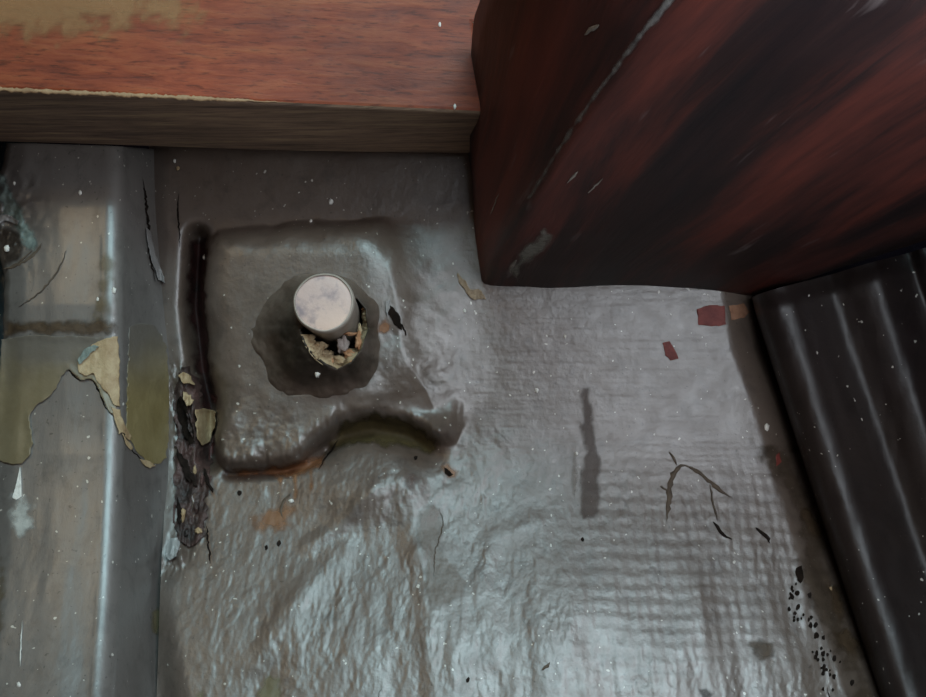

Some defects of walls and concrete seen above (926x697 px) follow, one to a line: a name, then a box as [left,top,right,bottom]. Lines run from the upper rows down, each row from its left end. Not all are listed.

peeling [0,323,216,468]
crack [660,452,733,540]
crack [755,527,770,543]